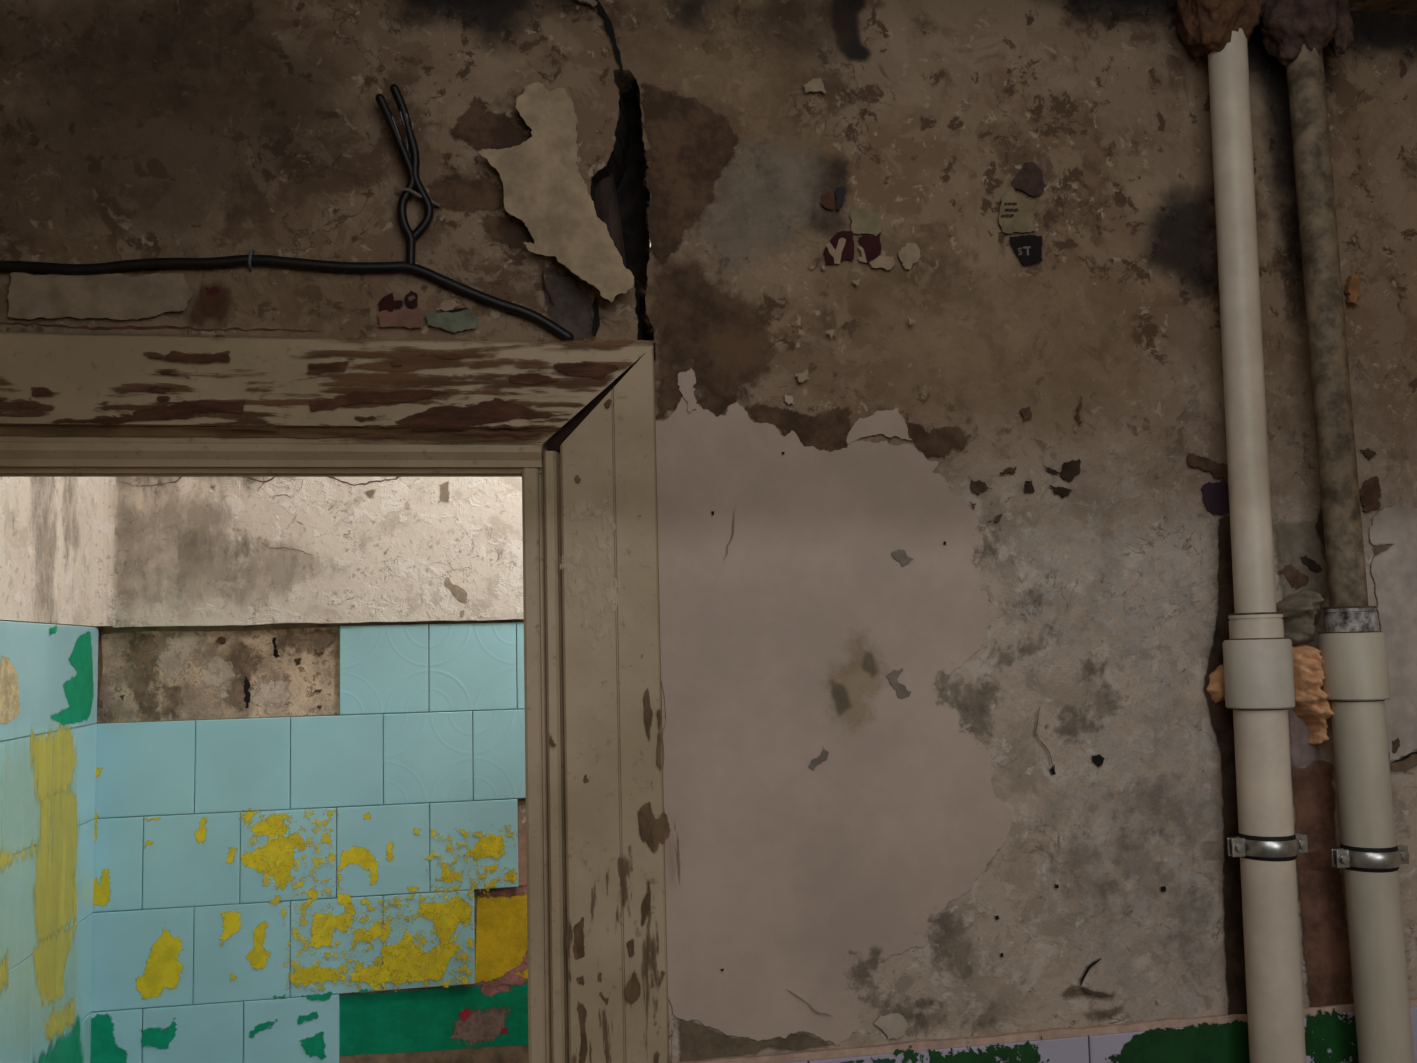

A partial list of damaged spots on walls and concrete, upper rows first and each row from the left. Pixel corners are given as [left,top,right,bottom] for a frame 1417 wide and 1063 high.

damp [403,0,531,34]
crack [595,0,624,80]
crack [592,297,600,336]
crack [122,477,182,487]
crack [329,477,399,486]
crack [247,477,311,555]
peeling [0,69,1081,1063]
mould [935,672,998,735]
damp [929,912,972,977]
damp [850,949,946,1034]
damp [1064,987,1122,1019]